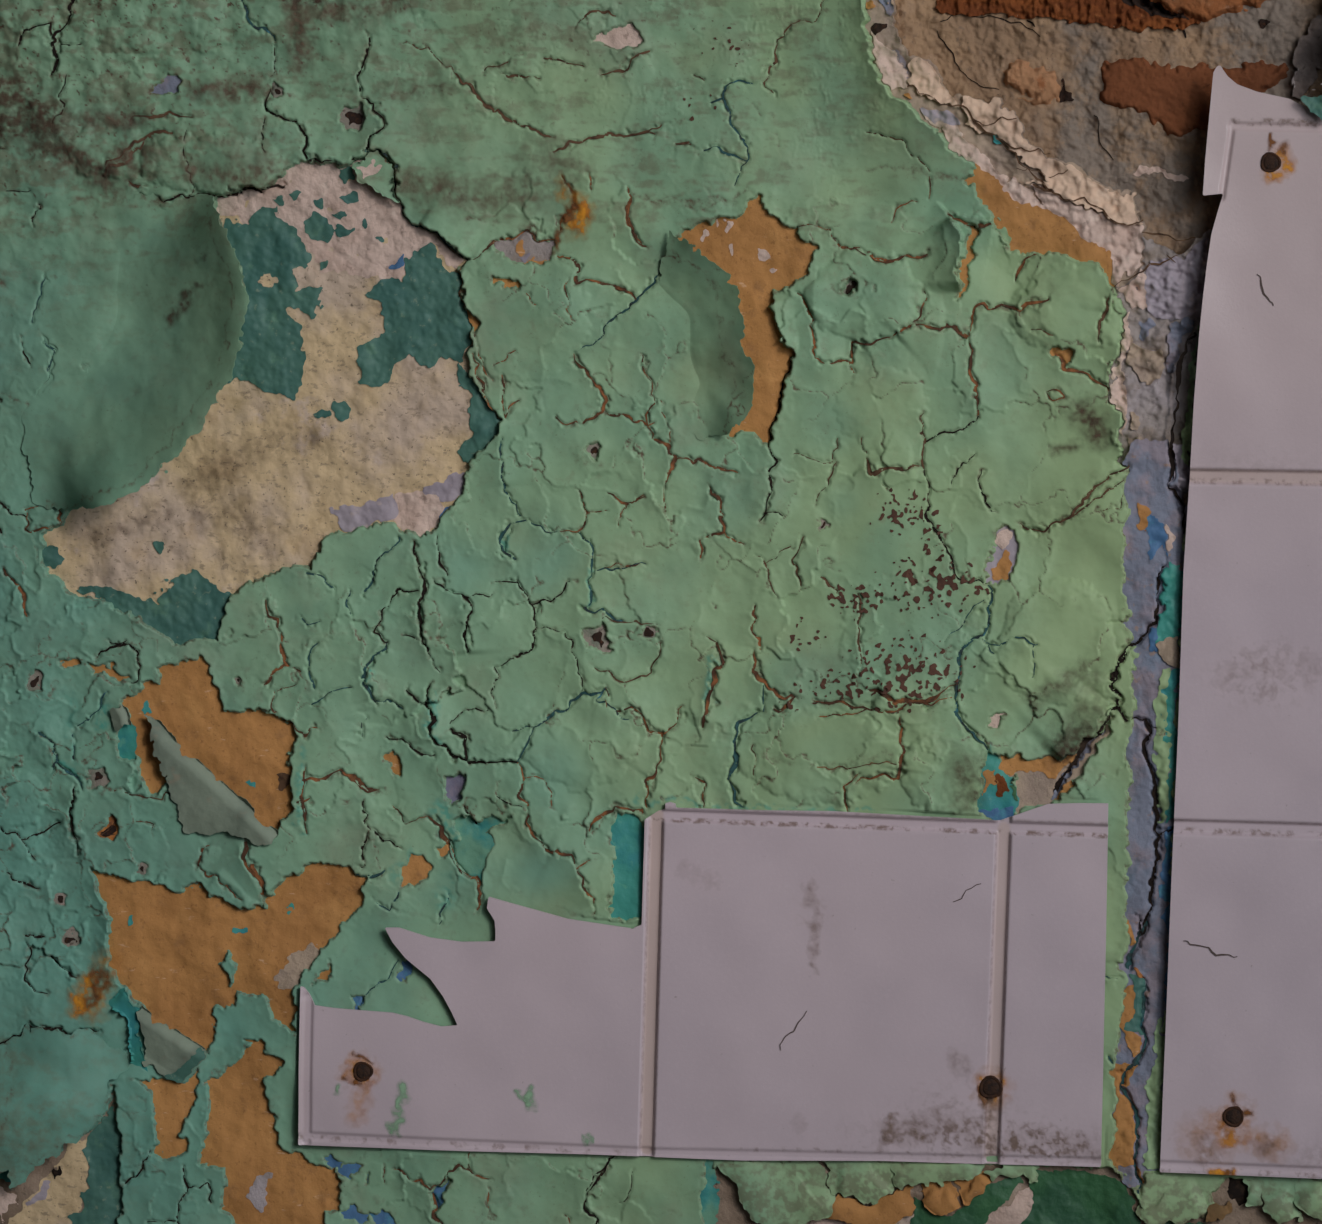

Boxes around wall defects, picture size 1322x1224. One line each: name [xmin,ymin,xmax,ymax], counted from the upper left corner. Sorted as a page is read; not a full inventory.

corrosion [1261,133,1293,180]
peeling [42,150,501,846]
crack [241,0,1130,925]
peeling [658,195,819,443]
flaking render [700,0,1322,1224]
crack [1168,332,1197,535]
crack [1,640,171,889]
crack [1053,566,1174,1195]
peeling [91,863,396,1224]
corrosion [342,1053,373,1085]
corrosion [978,1075,1005,1106]
corrosion [1222,1094,1252,1147]